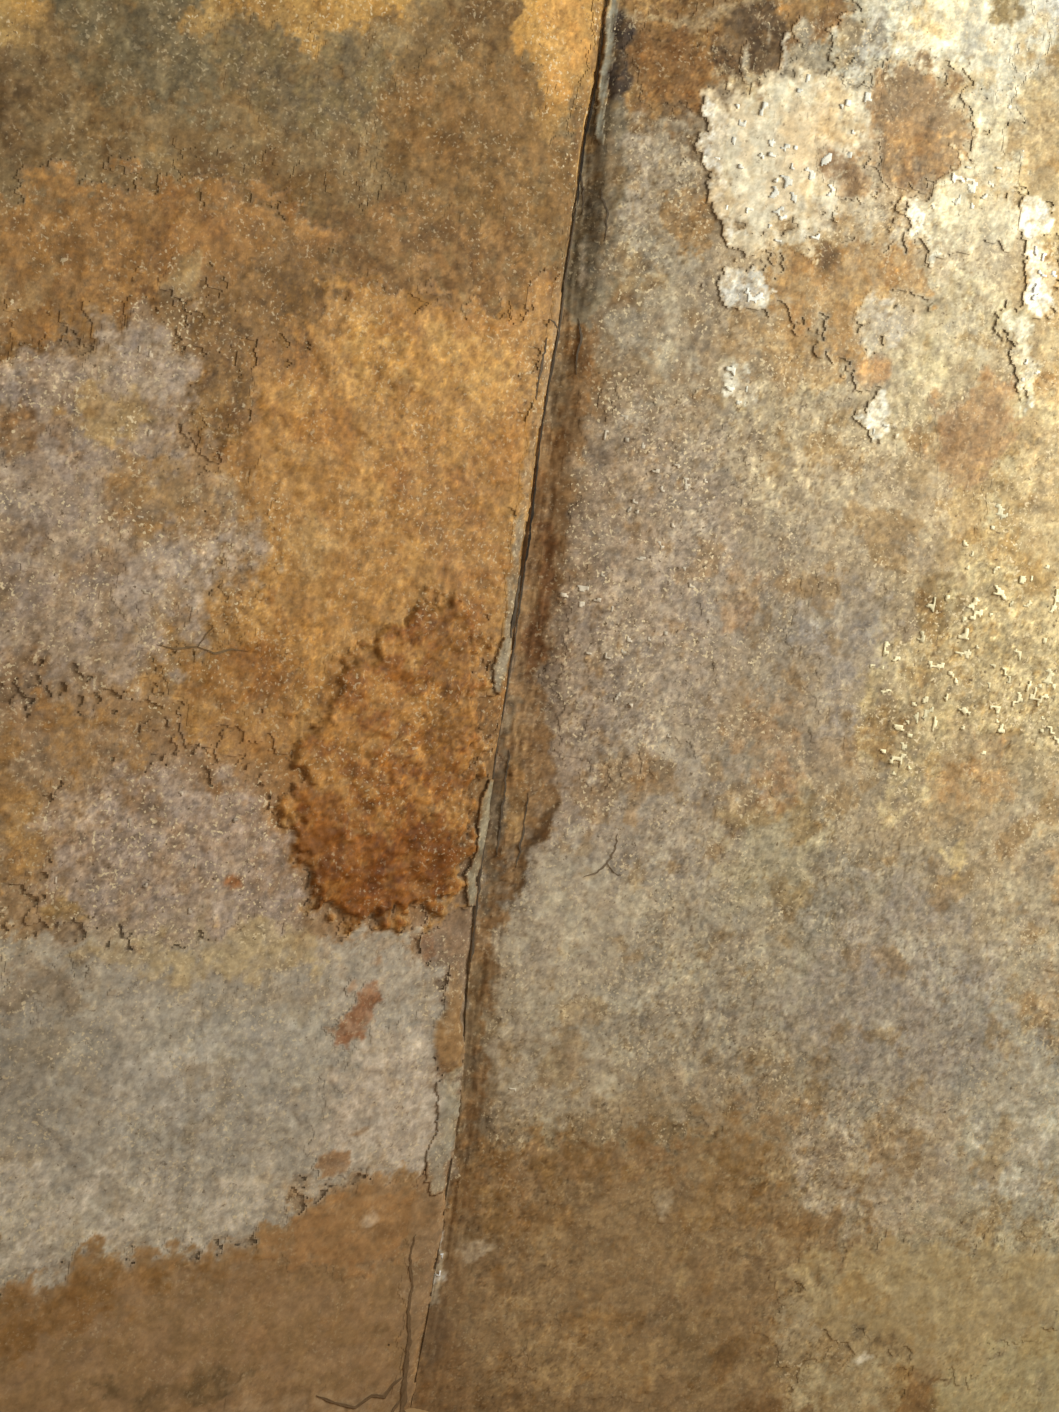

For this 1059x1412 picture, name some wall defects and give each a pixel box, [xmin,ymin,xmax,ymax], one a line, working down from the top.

rust [0,154,554,950]
leakage [0,0,858,1150]
crack [471,0,609,959]
efflorescence [853,387,900,444]
leakage [853,288,921,357]
efflorescence [893,195,947,268]
leakage [994,31,1059,420]
crack [584,834,618,877]
leakage [747,833,1026,1110]
crack [316,1234,416,1412]
leakage [0,1083,1059,1412]